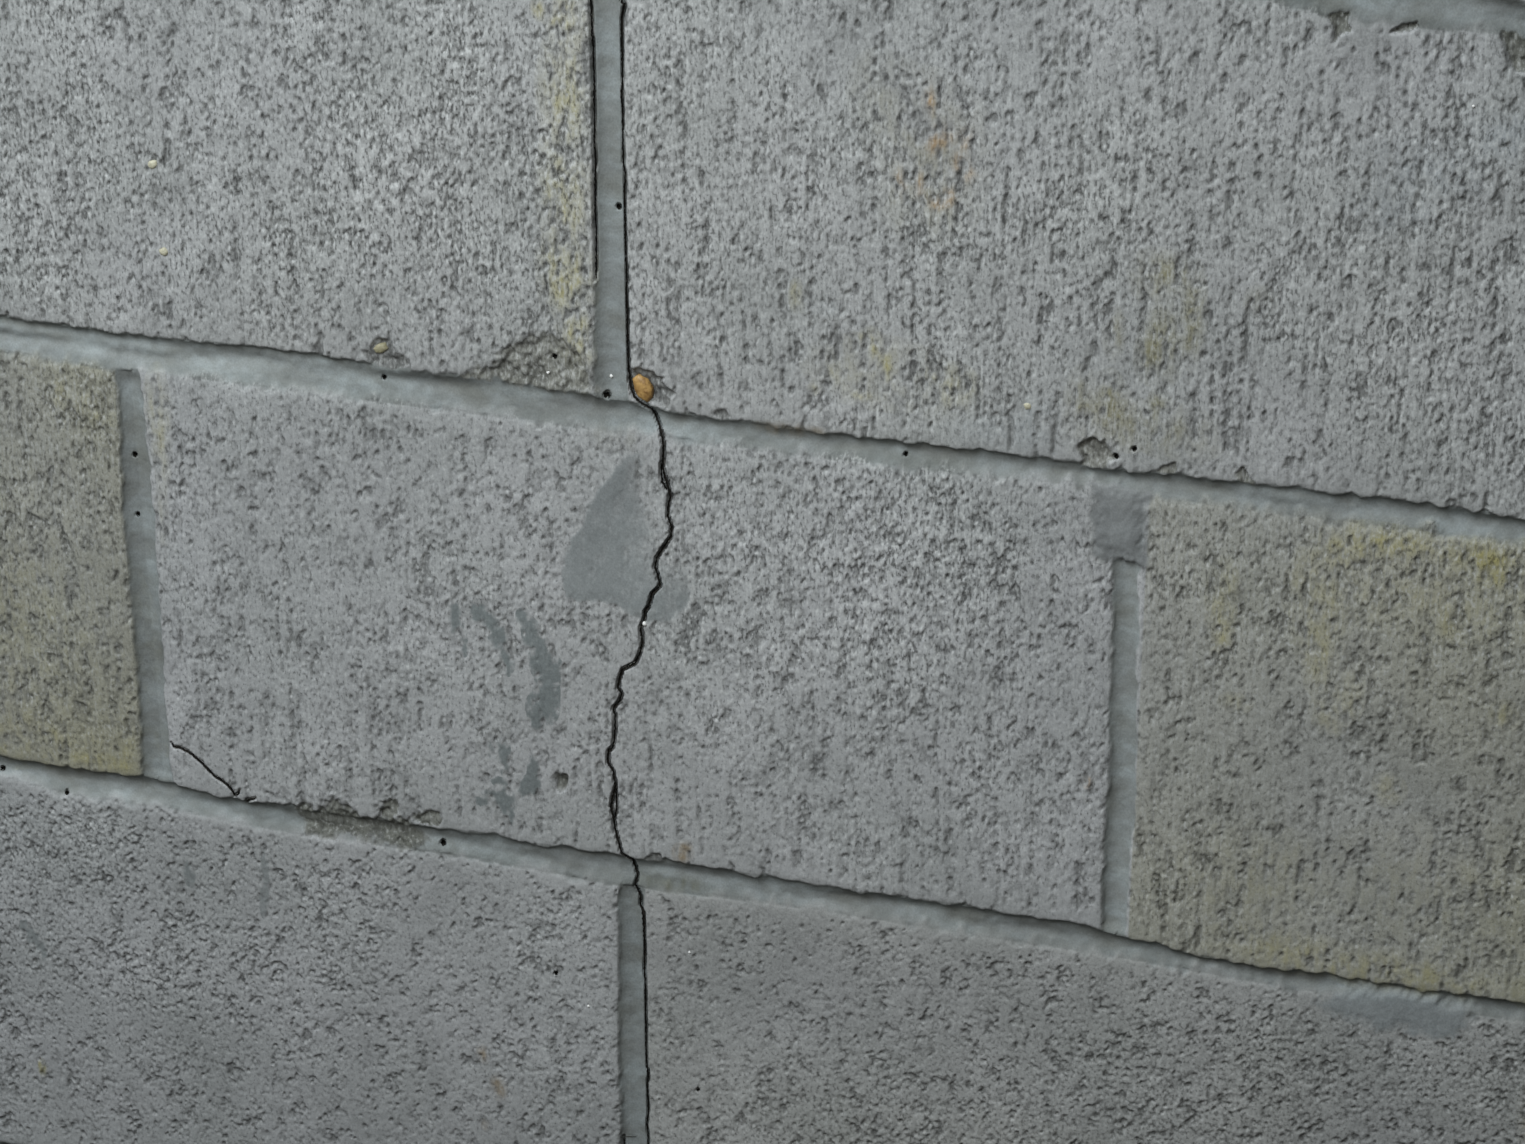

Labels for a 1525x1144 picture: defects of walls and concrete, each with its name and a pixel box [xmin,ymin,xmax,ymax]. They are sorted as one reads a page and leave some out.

crack [590,0,673,1144]